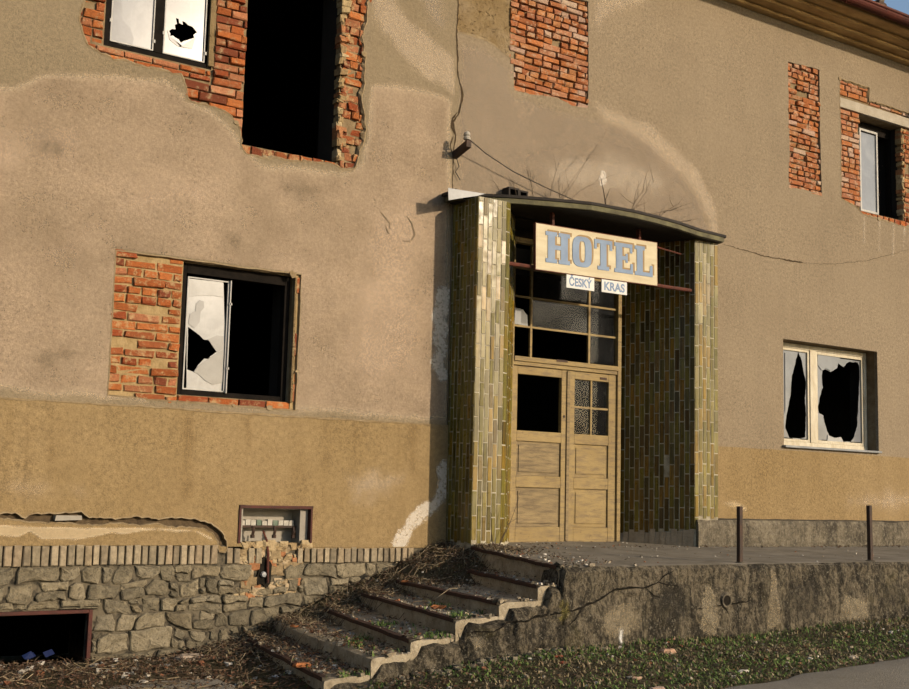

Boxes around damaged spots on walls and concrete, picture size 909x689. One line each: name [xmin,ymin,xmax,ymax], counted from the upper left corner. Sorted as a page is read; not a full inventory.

flaking render [457,0,515,59]
flaking render [78,0,369,170]
crack [450,0,464,184]
flaking render [839,77,909,151]
damp [0,0,717,420]
crack [726,245,905,264]
flaking render [107,250,302,411]
peeling [0,525,151,540]
spalling [234,540,313,600]
damp [393,460,447,547]
crack [458,571,678,655]